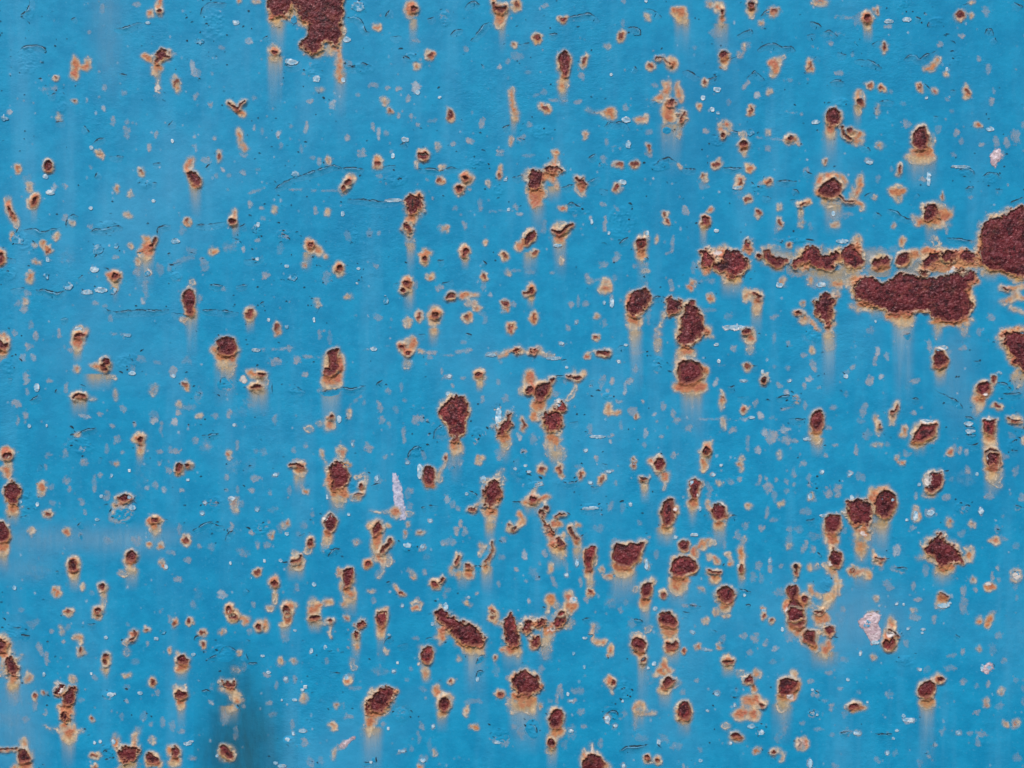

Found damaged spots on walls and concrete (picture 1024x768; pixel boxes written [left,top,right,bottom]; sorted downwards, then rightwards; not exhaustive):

corrosion [237,0,346,82]
corrosion [875,124,936,200]
corrosion [625,192,1024,407]
corrosion [210,336,268,399]
corrosion [320,347,351,430]
corrosion [421,394,471,488]
corrosion [288,448,367,571]
corrosion [417,440,746,730]
corrosion [761,486,900,660]
corrosion [920,519,974,578]
corrosion [364,685,399,745]
corrosion [494,669,566,753]